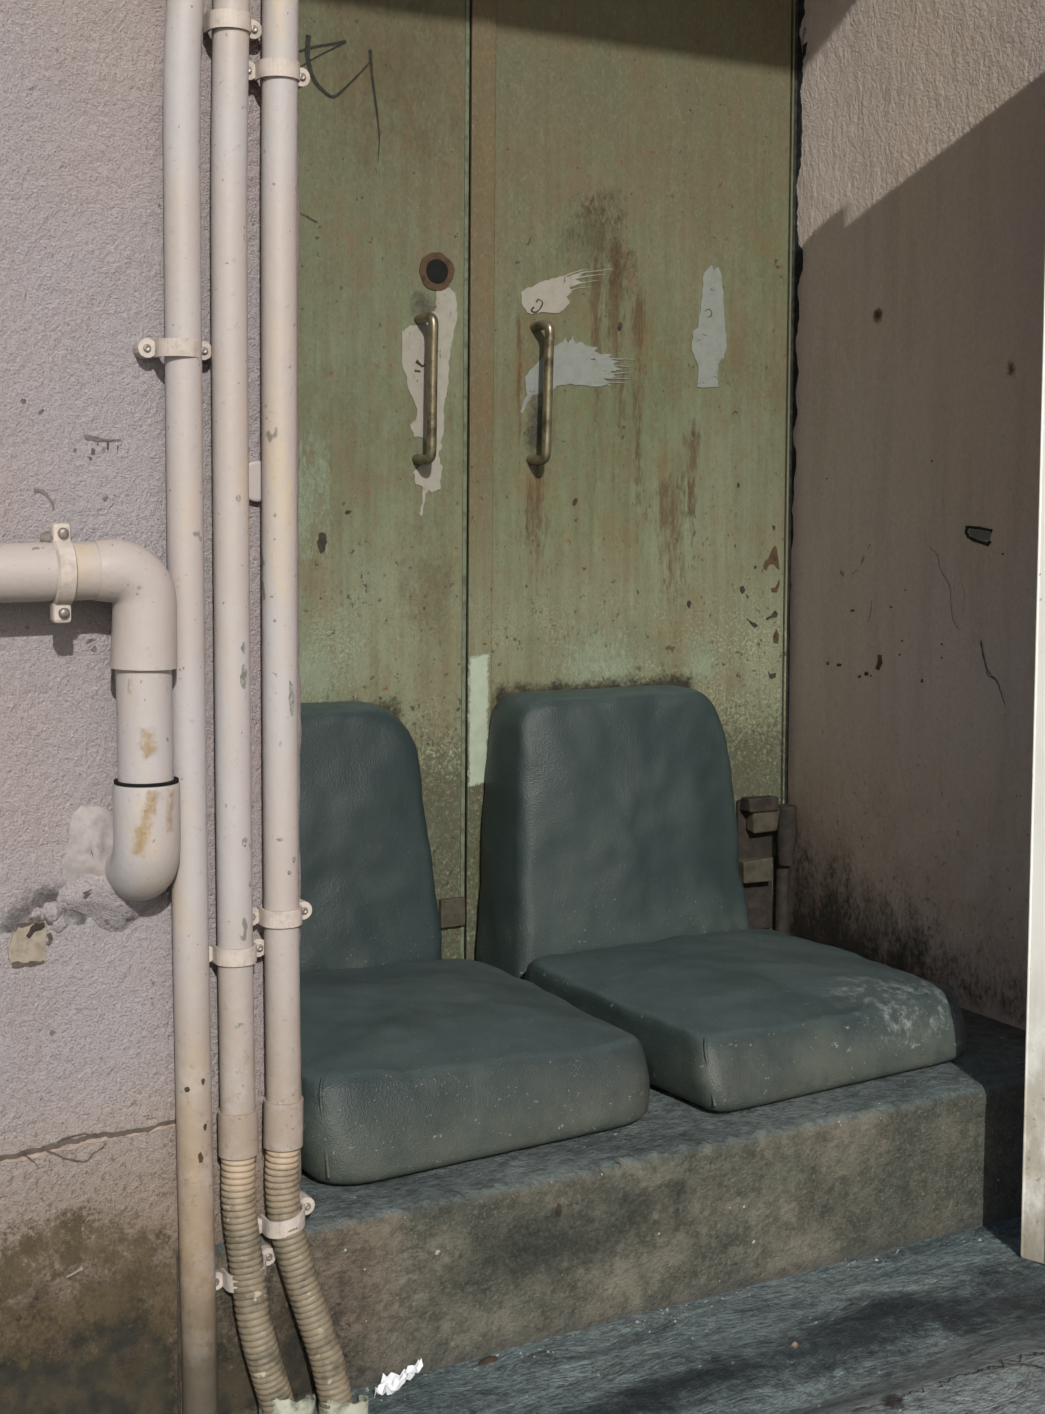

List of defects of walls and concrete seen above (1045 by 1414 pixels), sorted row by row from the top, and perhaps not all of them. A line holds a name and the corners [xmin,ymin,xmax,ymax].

flaking render [6,890,85,968]
damp [791,850,1011,1014]
crack [0,1119,176,1169]
damp [0,1207,179,1414]
crack [845,1352,1045,1412]